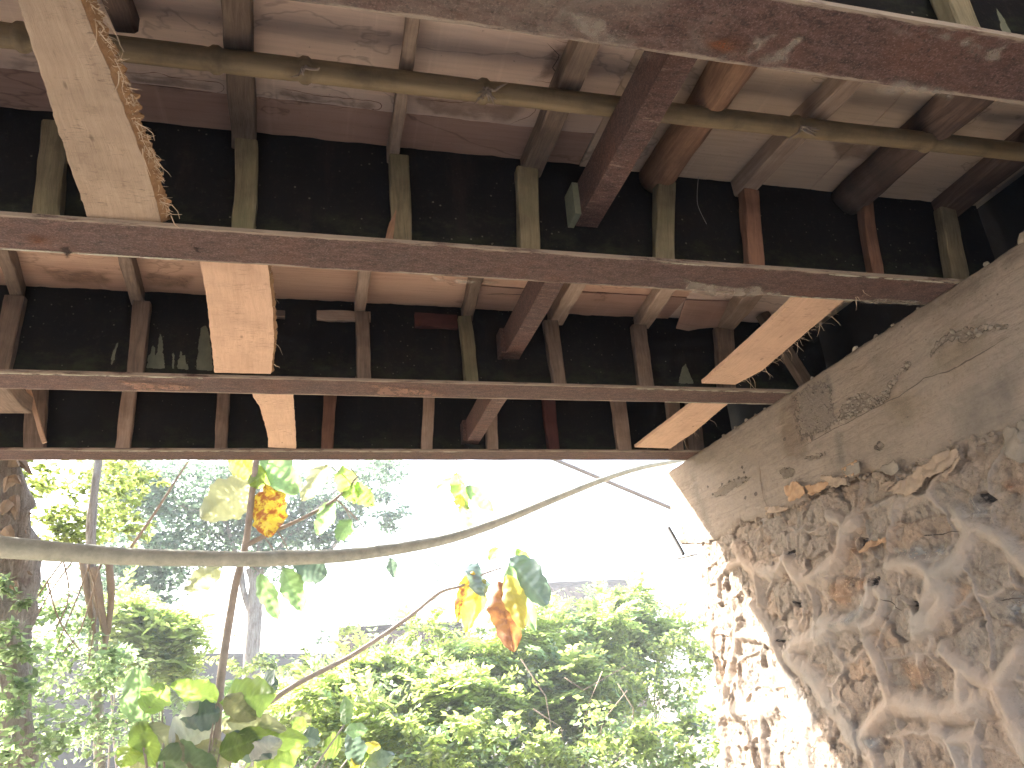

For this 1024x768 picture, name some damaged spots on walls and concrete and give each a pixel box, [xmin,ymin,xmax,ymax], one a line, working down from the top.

crack [720,330,1024,505]
spalling [842,459,926,486]
spalling [729,485,835,531]